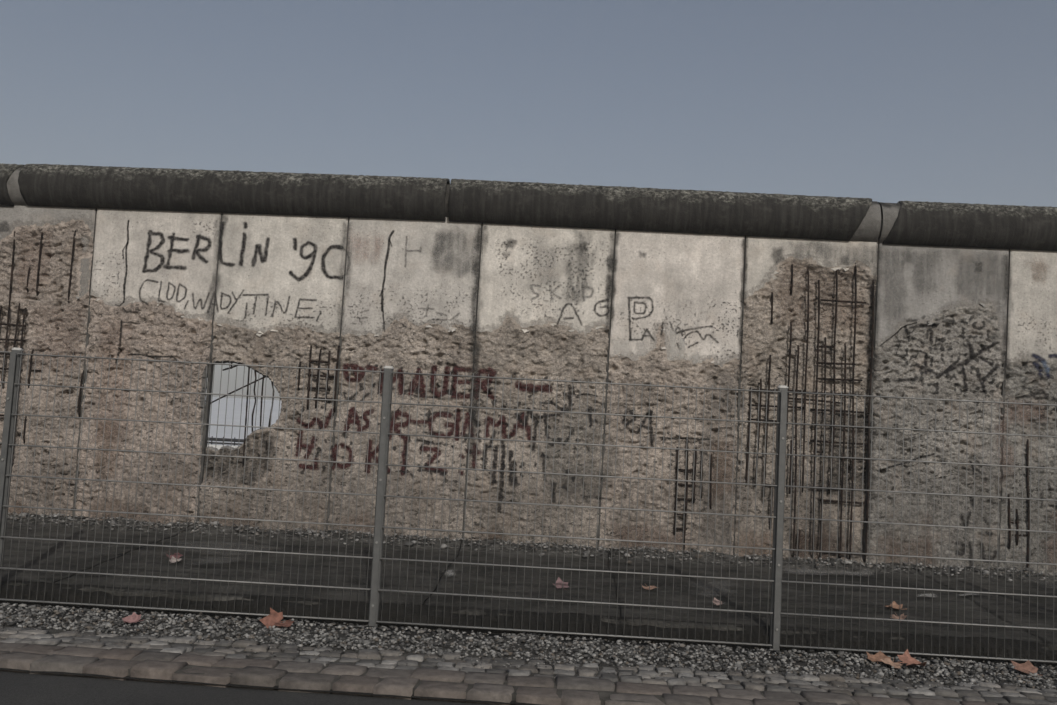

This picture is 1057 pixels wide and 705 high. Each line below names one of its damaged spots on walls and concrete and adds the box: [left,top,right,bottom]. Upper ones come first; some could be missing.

spalling [0,219,1057,576]